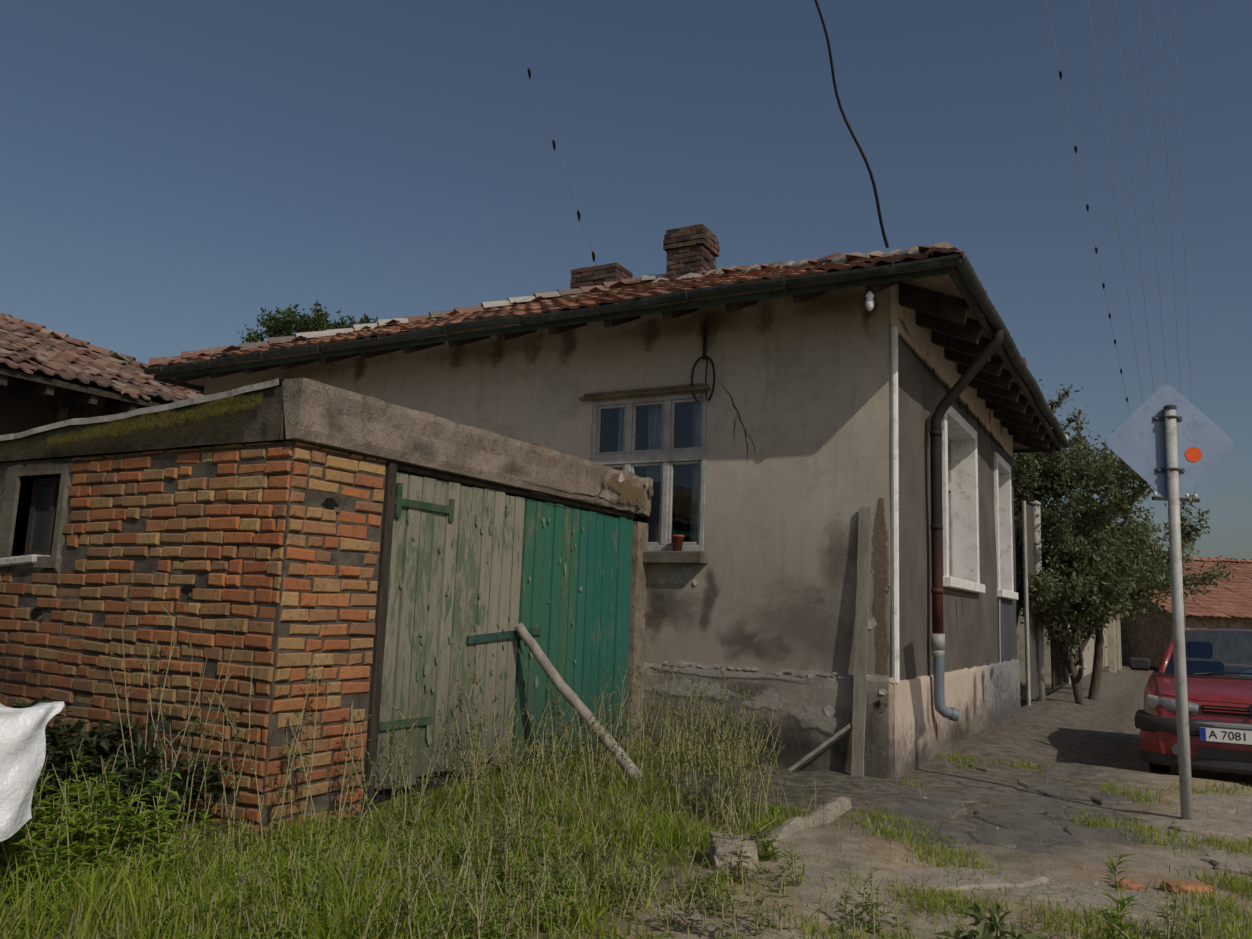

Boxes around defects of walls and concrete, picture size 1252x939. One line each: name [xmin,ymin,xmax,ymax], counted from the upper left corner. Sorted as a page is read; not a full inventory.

leakage [703,573,717,625]
spalling [646,661,854,734]
leakage [952,667,994,741]